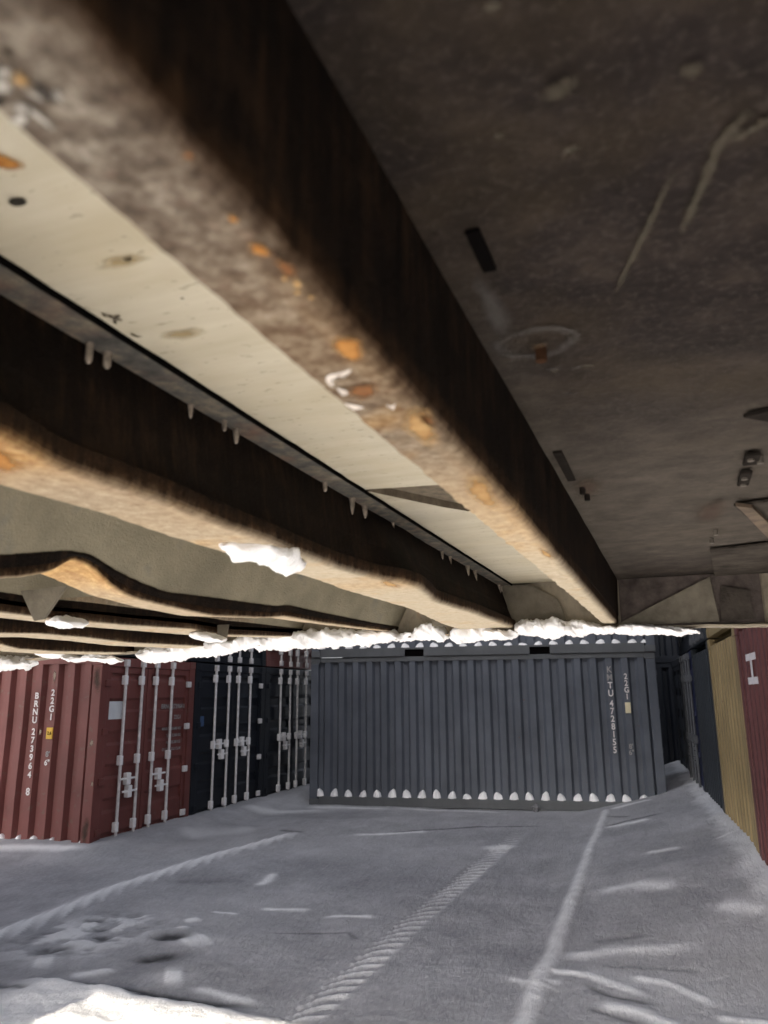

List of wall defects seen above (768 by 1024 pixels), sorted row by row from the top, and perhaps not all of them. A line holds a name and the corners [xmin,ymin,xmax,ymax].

rust [0,156,21,169]
rust [251,244,314,299]
rust [334,339,361,360]
rust [408,412,435,442]